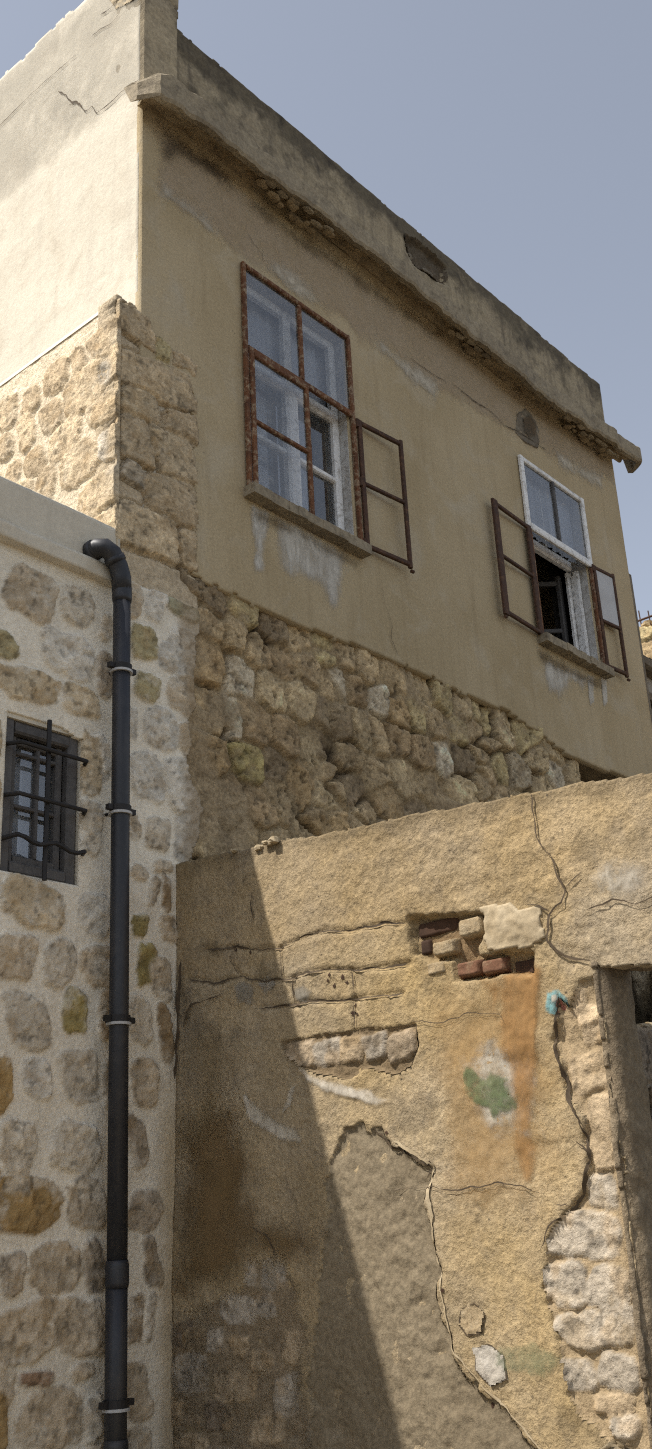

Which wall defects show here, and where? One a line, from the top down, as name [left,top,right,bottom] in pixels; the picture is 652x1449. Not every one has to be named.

crack [1,0,138,124]
peeling [161,138,611,486]
leakage [252,506,341,604]
crack [524,794,652,961]
leakage [179,1115,301,1288]
flaking render [243,1003,418,1141]
flaking render [171,1123,541,1449]
crack [373,996,591,1252]
peeling [479,1050,518,1123]
flaking render [542,976,650,1449]